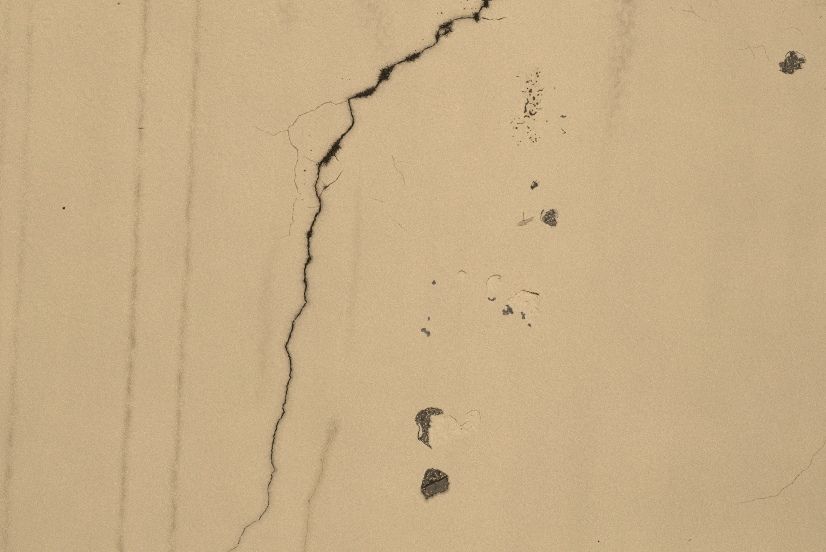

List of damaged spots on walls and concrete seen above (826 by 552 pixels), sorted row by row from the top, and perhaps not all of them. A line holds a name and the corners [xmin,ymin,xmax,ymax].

spalling [779,51,807,74]
spalling [517,209,558,228]
crack [228,0,506,552]
spalling [415,405,486,454]
spalling [421,468,450,499]